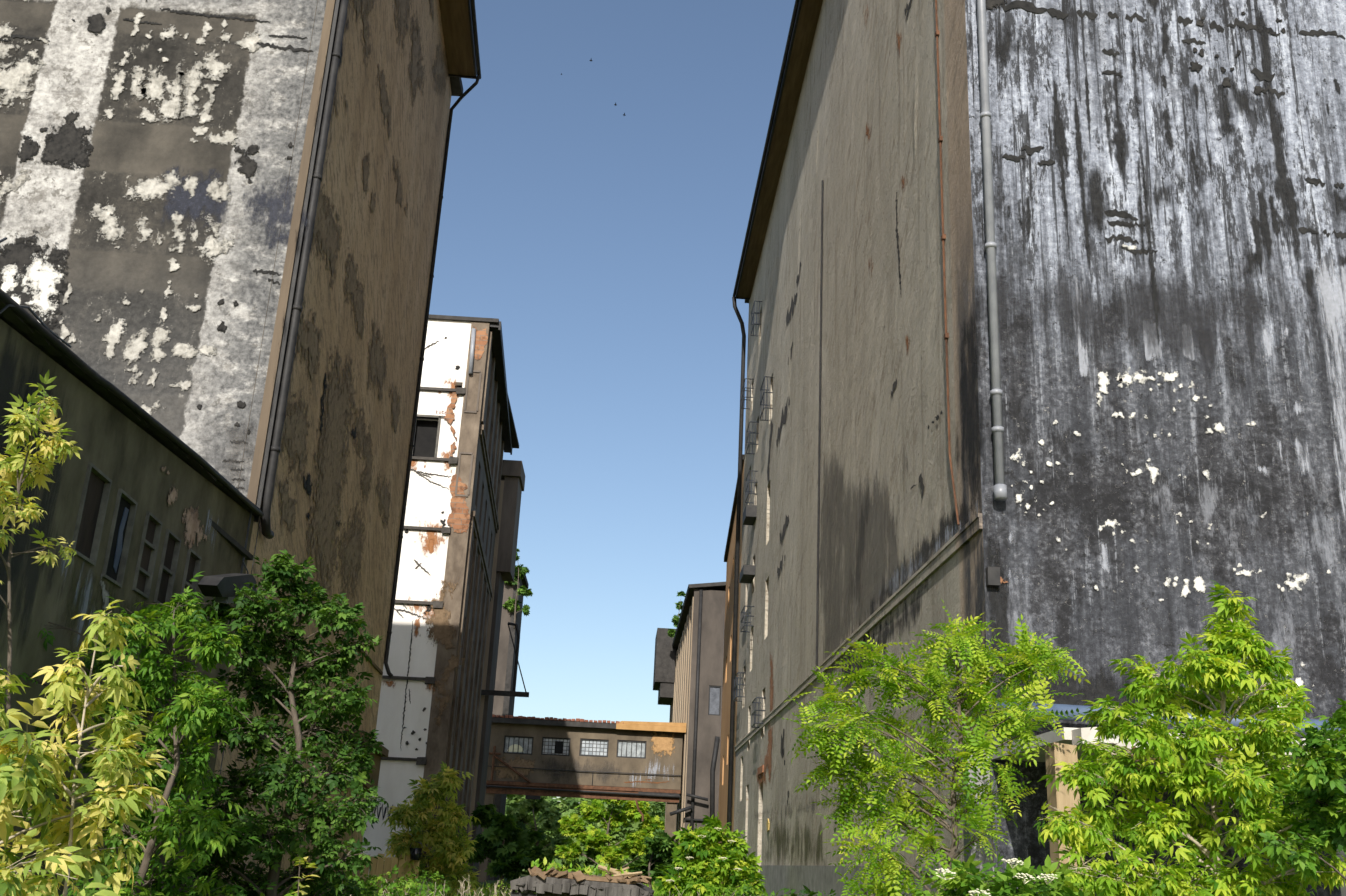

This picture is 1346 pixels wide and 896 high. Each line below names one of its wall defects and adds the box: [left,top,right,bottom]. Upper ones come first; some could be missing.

peeling [0,19,54,110]
spalling [71,6,111,35]
leakage [995,24,1028,64]
spalling [0,110,94,203]
peeling [89,12,262,415]
leakage [1008,196,1031,238]
spalling [0,229,76,344]
leakage [1030,0,1346,515]
peeling [1096,367,1226,434]
peeling [1010,439,1073,517]
peeling [1121,458,1159,485]
peeling [1159,576,1206,601]